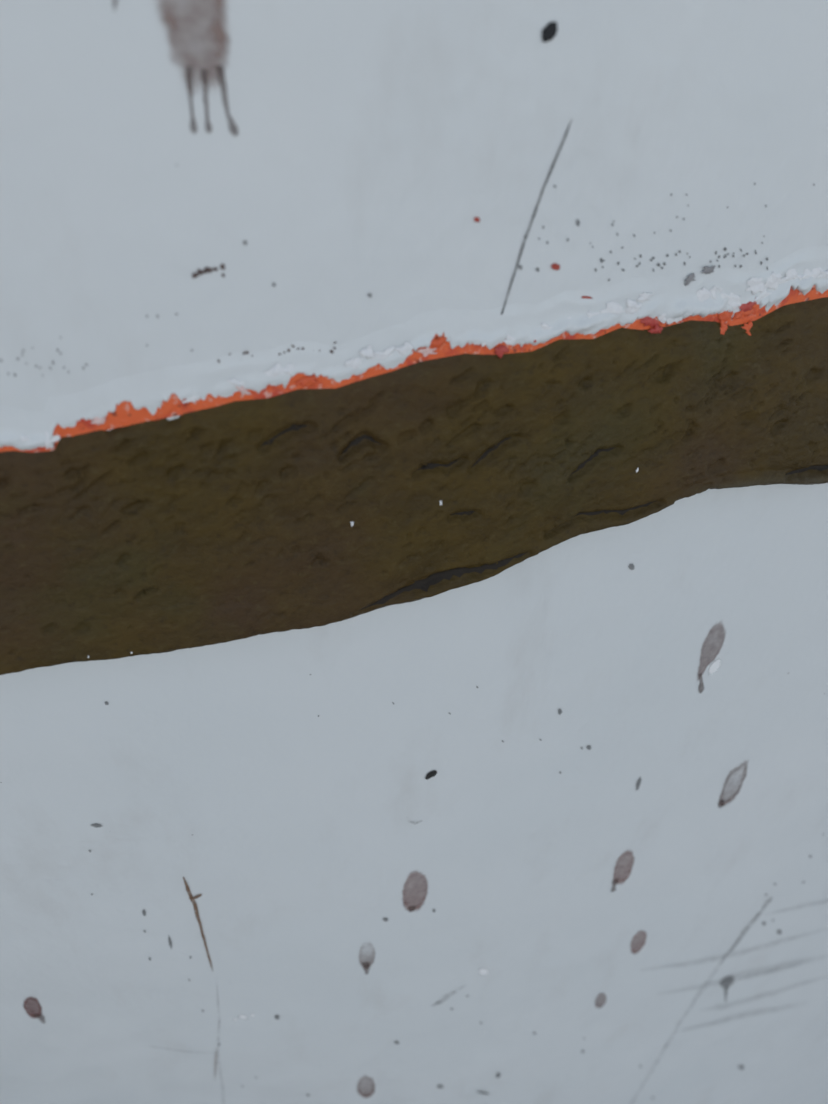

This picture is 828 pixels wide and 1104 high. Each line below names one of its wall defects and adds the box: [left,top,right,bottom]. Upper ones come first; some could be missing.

peeling [0,246,828,453]
peeling [708,659,721,674]